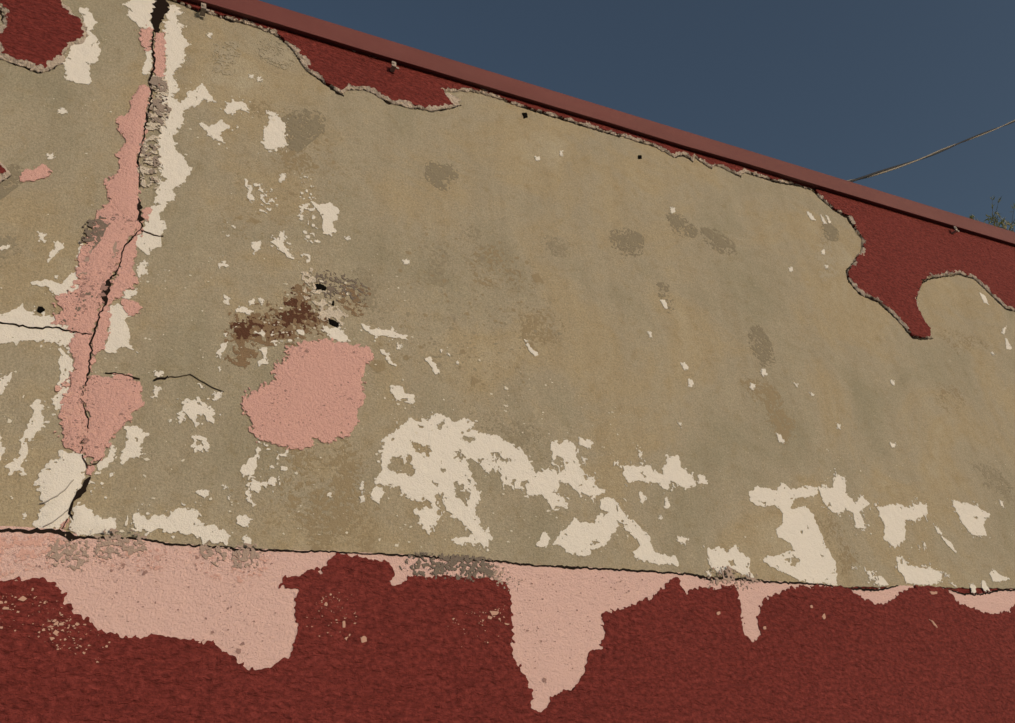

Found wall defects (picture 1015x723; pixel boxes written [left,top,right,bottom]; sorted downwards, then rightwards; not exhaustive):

spalling [0,0,170,317]
corrosion [224,283,331,369]
corrosion [338,284,371,317]
crack [0,0,898,591]
spalling [387,440,432,476]
peeling [0,340,336,670]
spalling [453,481,471,506]
peeling [476,561,505,580]
peeling [688,575,815,642]
crack [942,587,1015,596]